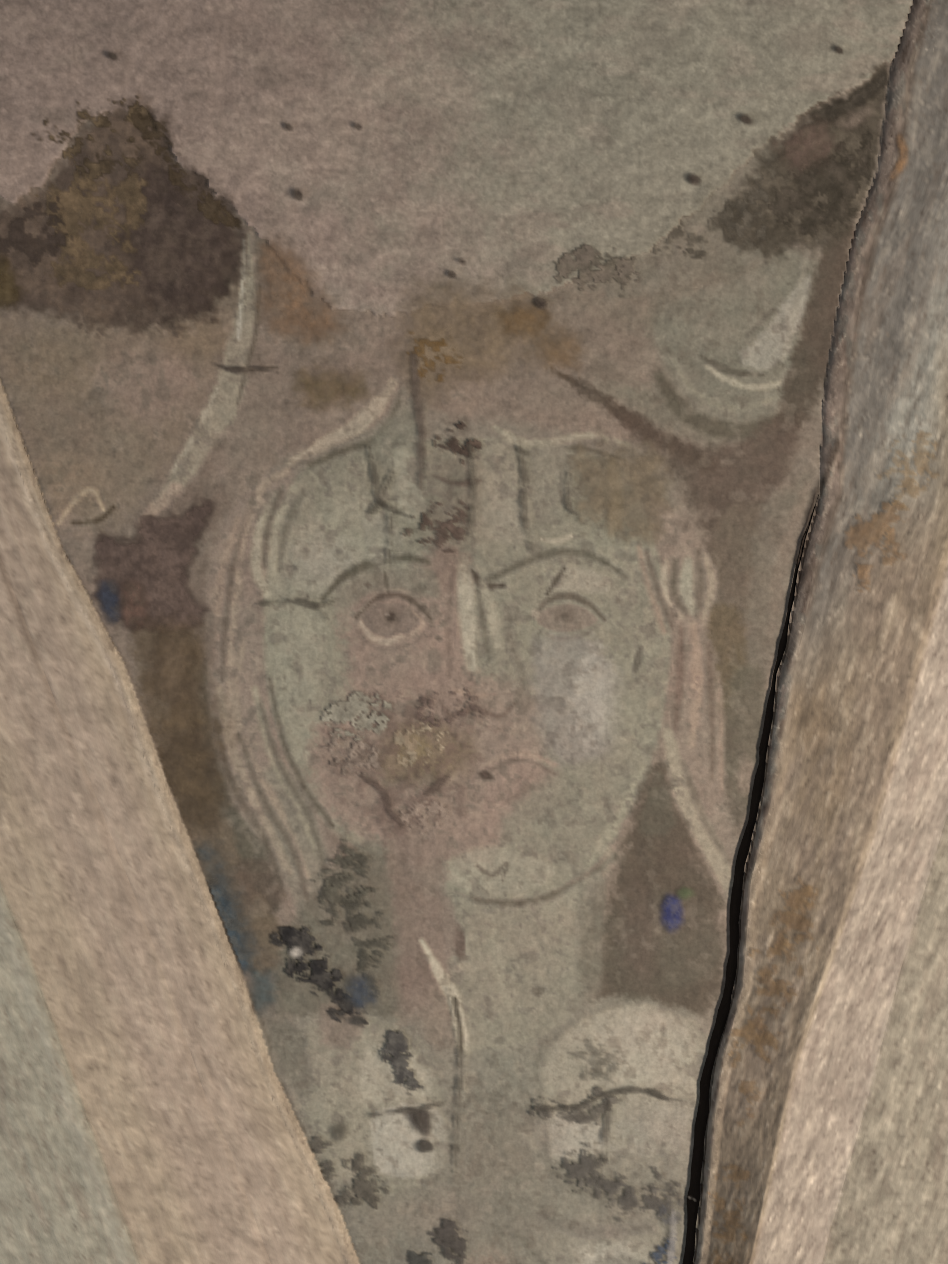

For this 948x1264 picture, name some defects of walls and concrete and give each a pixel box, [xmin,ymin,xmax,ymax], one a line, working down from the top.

crack [535,442,839,1264]